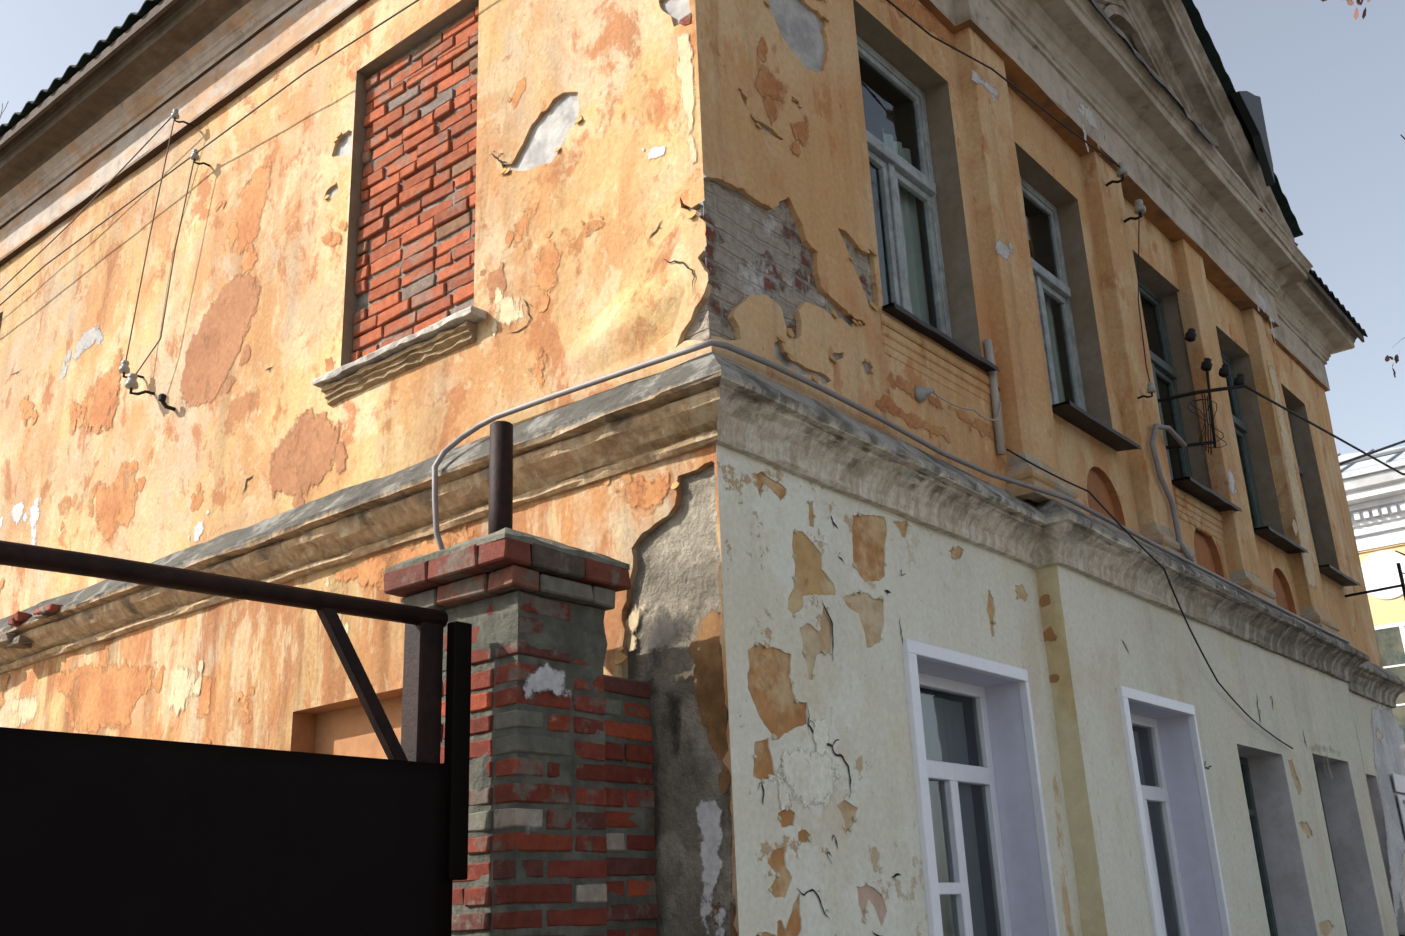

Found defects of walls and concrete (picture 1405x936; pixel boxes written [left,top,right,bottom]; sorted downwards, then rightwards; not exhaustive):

peeling [662,0,697,164]
flaking render [739,0,830,157]
flaking render [499,94,582,175]
peeling [642,146,665,159]
flaking render [684,180,878,384]
peeling [862,358,1006,447]
peeling [756,471,785,500]
spalling [0,603,63,649]
peeling [55,647,215,734]
flaking render [603,464,738,936]
peeling [747,500,909,936]
crack [808,710,851,799]